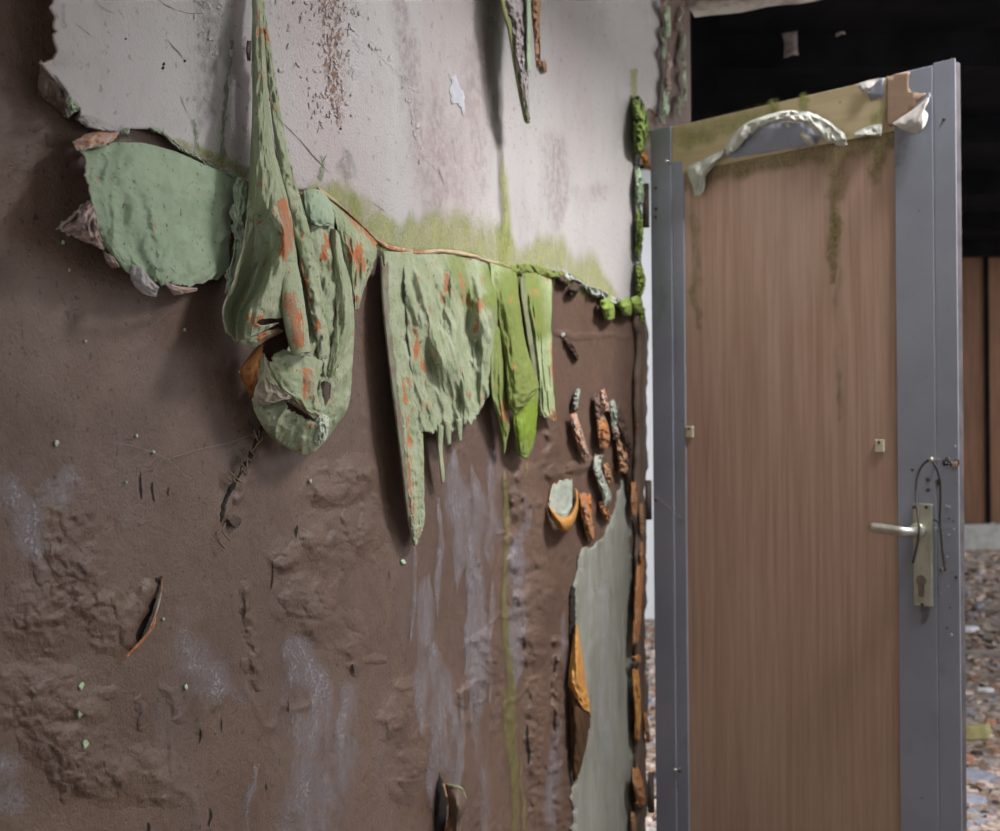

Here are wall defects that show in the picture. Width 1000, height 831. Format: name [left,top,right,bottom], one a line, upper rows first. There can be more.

peeling [38,0,579,546]
peeling [632,5,687,325]
peeling [687,72,931,196]
efflorescence [283,638,350,831]
spalling [548,389,651,831]